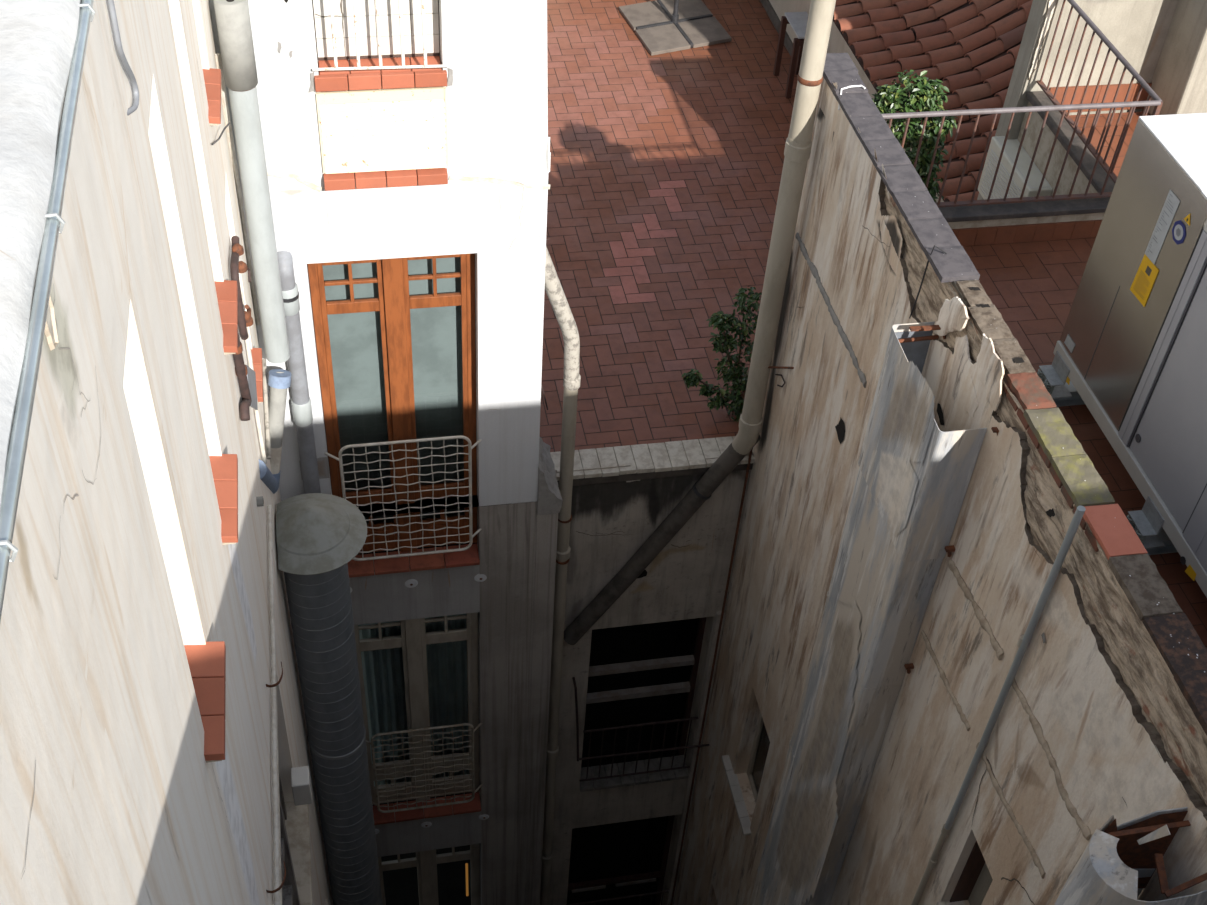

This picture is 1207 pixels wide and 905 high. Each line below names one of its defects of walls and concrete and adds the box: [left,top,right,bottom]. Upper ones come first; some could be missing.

spalling [878,179,921,323]
damp [38,264,86,426]
crack [53,292,101,580]
damp [555,465,704,589]
spalling [971,334,1207,820]